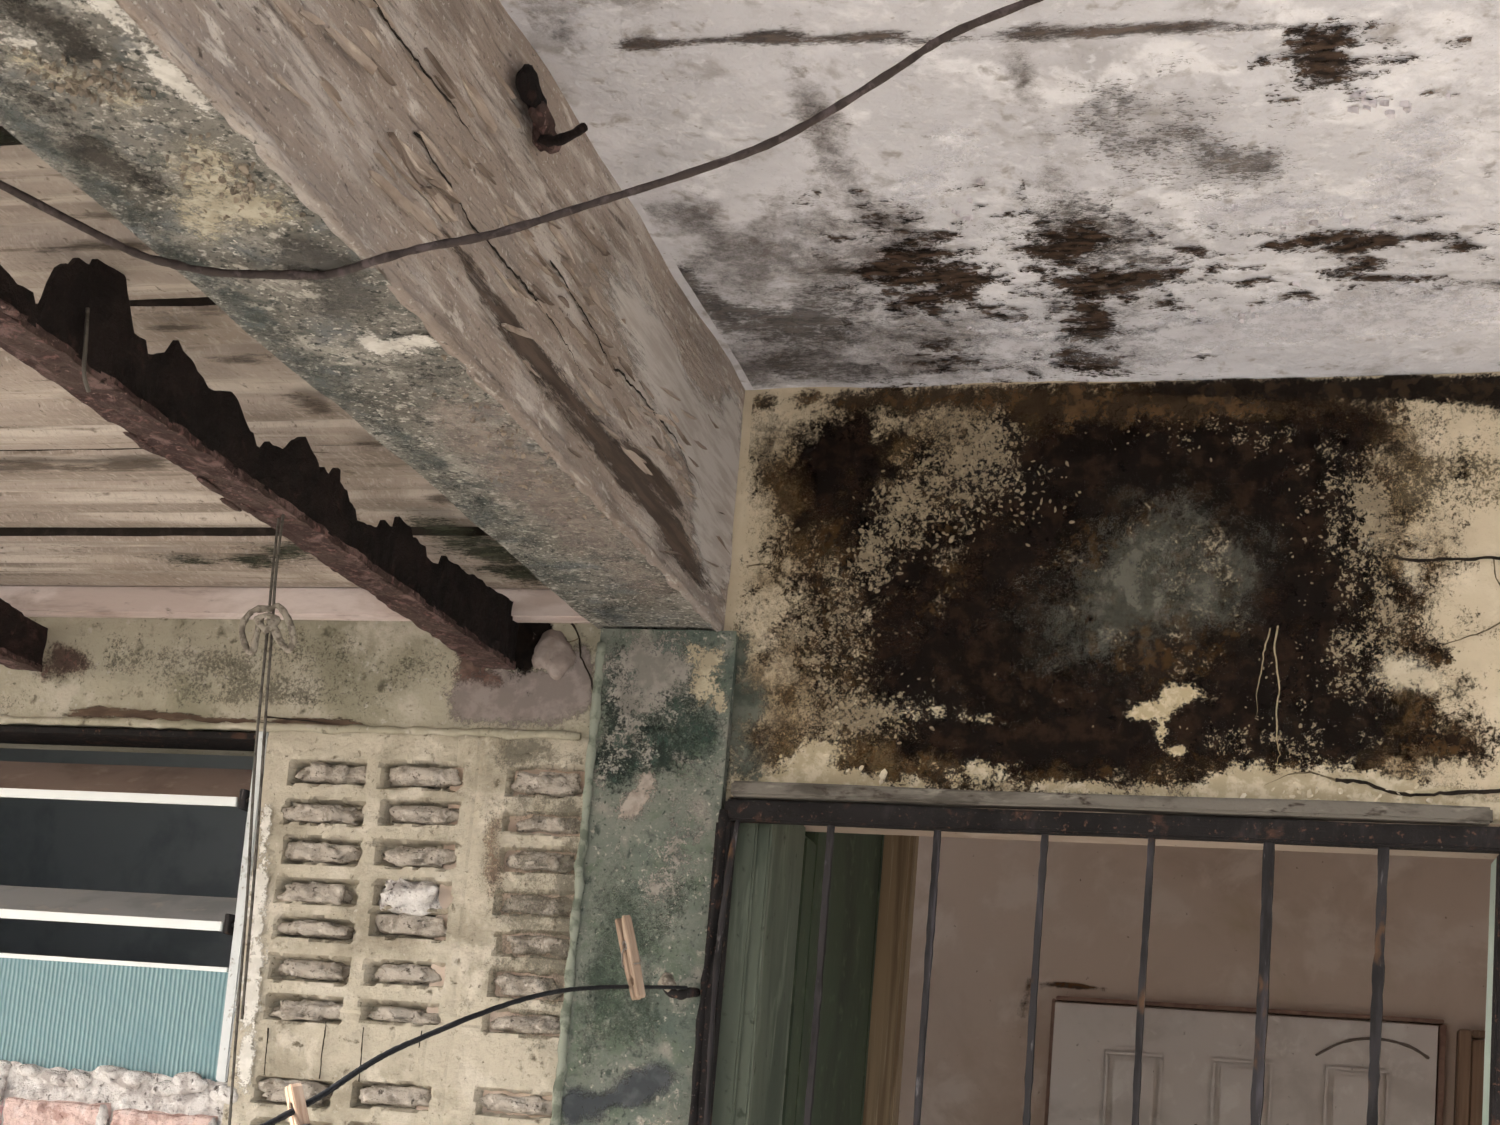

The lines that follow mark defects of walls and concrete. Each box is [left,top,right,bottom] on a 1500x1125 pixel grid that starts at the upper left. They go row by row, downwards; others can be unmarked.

corrosion [0,298,22,320]
damp [593,16,1500,799]
corrosion [123,432,256,514]
crack [1393,555,1500,585]
corrosion [36,642,90,683]
corrosion [453,651,502,688]
crack [1256,622,1500,824]
damp [561,1063,674,1125]